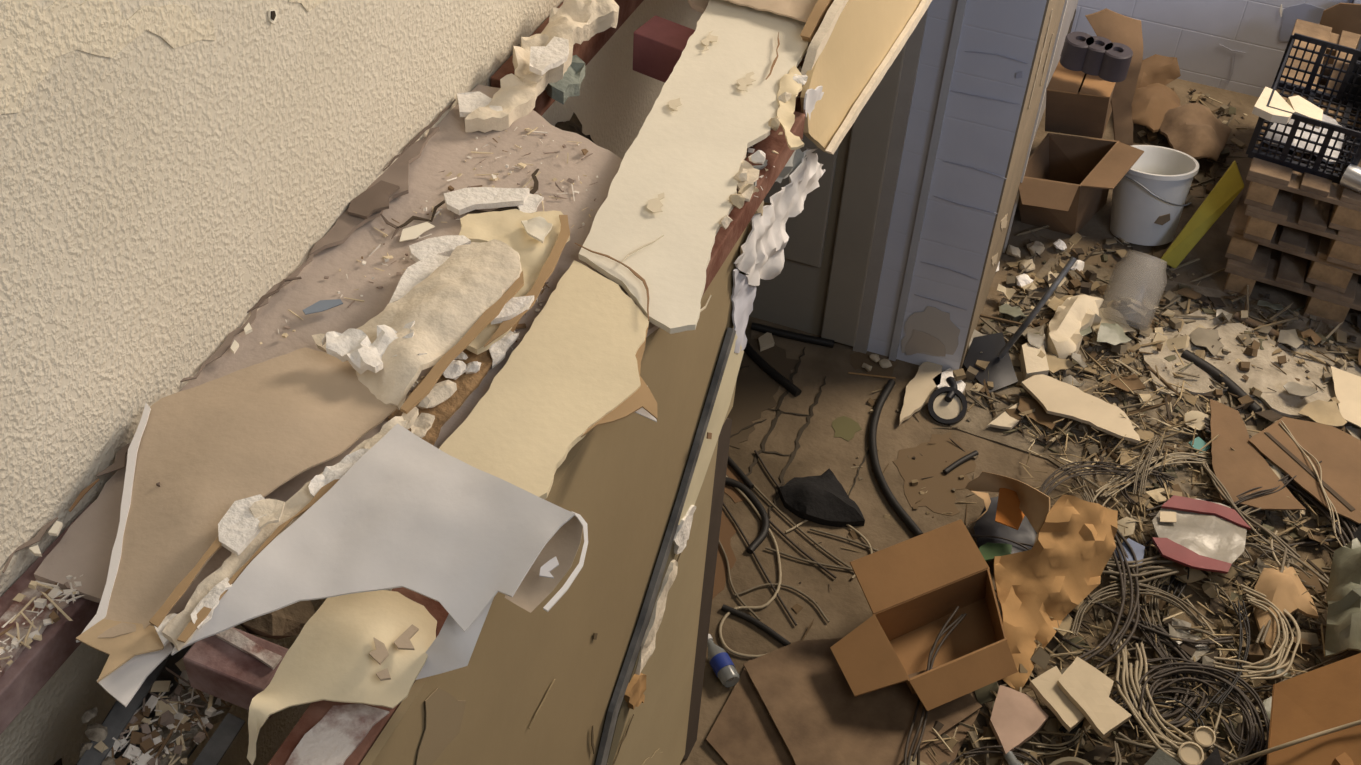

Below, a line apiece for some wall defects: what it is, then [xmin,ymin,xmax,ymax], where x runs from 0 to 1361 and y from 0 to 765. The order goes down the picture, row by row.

spalling [309,127,439,256]
spalling [230,323,252,354]
crack [730,347,826,518]
crack [848,450,869,496]